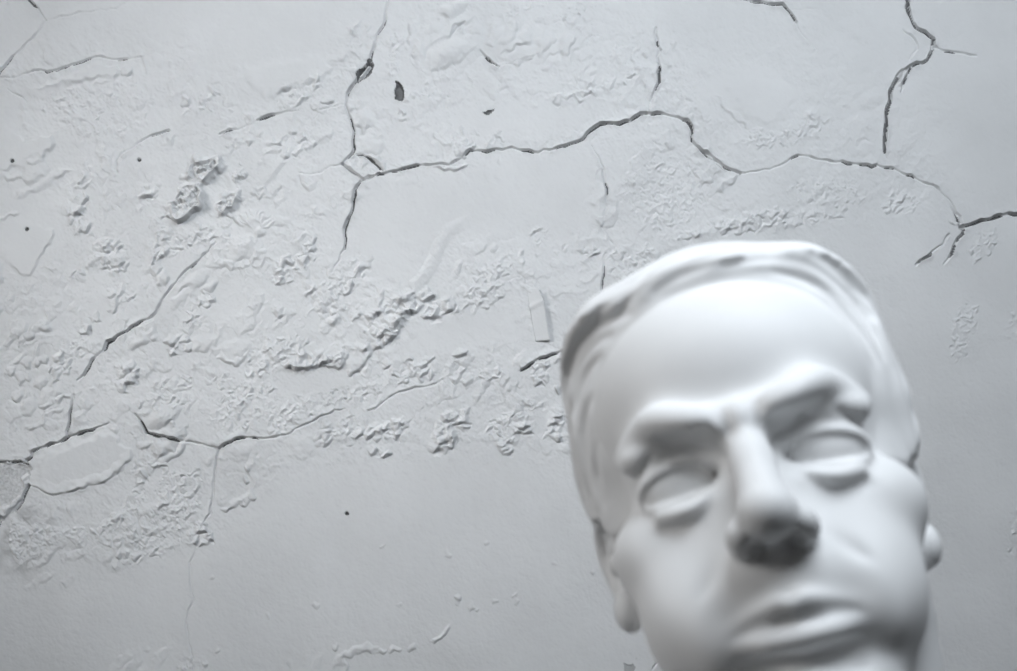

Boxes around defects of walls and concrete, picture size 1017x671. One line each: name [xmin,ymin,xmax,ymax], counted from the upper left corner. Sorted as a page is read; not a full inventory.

crack [0,0,154,105]
peeling [134,159,239,269]
crack [71,0,1017,292]
spalling [0,429,214,570]
crack [23,239,448,671]